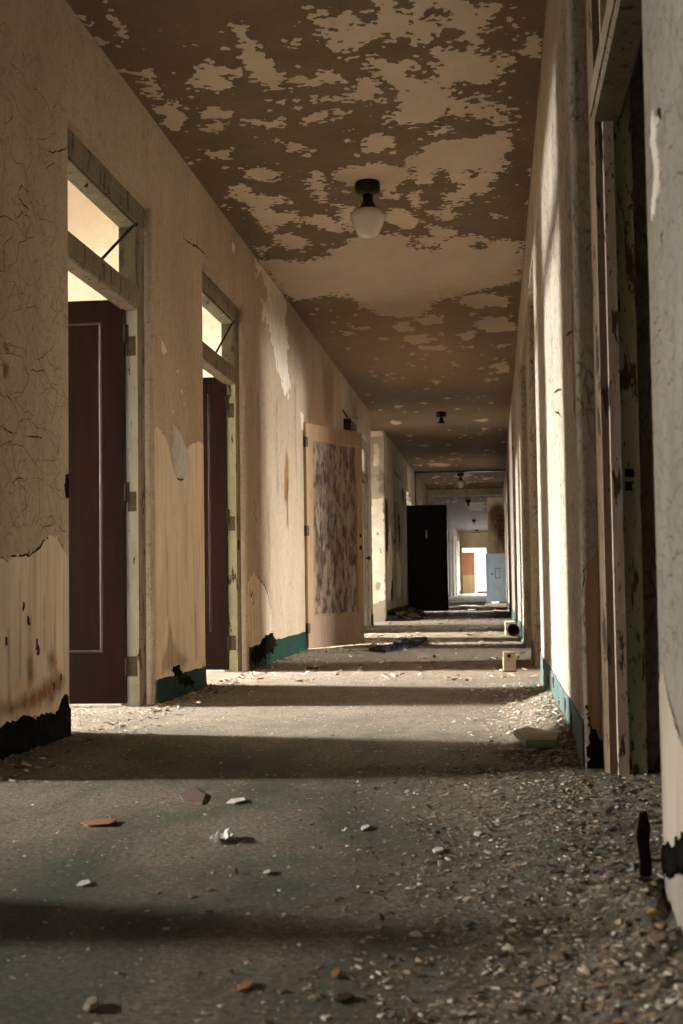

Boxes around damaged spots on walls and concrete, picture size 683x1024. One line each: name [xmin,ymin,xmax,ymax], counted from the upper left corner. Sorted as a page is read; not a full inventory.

peeling [77,0,129,48]
crack [0,22,70,562]
peeling [118,0,543,604]
peeling [0,535,69,728]
peeling [155,426,206,685]
peeling [659,672,683,879]